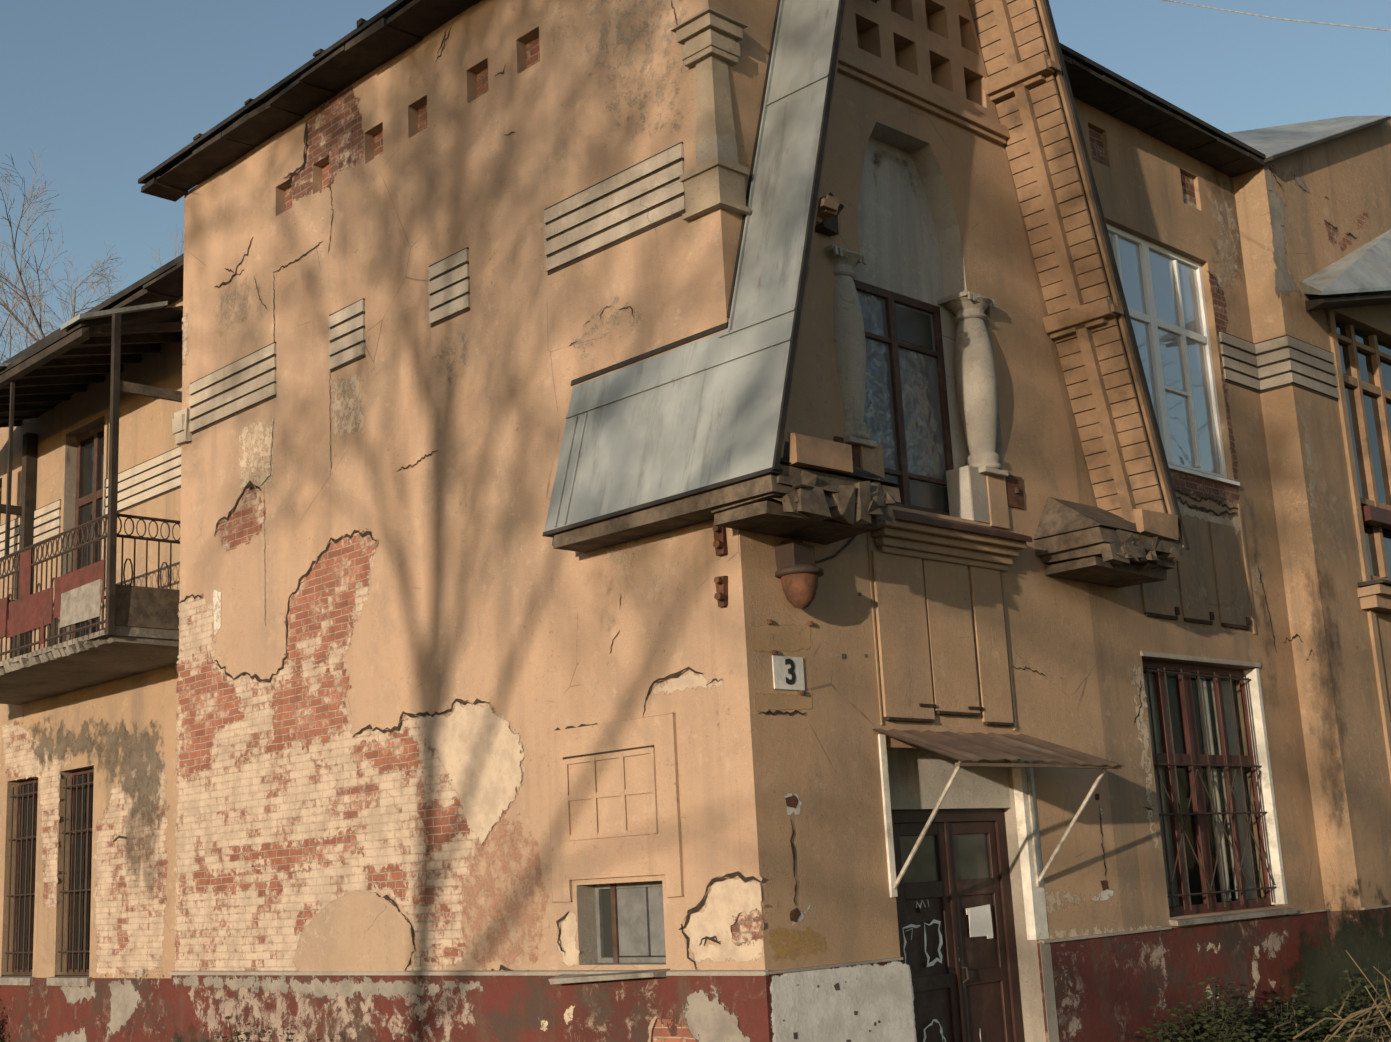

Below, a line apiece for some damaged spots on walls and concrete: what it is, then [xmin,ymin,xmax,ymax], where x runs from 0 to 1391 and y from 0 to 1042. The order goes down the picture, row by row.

peeling [284,85,364,201]
crack [215,177,333,342]
peeling [214,417,275,551]
spalling [644,664,724,700]
peeling [1,720,71,909]
water stain [31,720,165,879]
peeling [61,526,580,1042]
spalling [678,870,764,970]
crack [789,821,797,906]
peeling [1248,931,1288,1006]
peeling [55,1027,87,1042]
peeling [648,1016,698,1042]